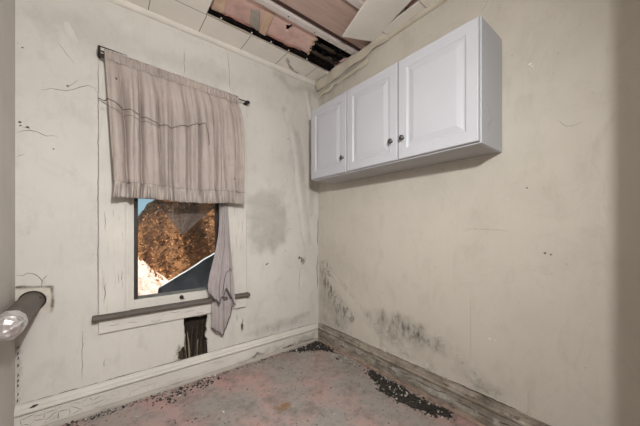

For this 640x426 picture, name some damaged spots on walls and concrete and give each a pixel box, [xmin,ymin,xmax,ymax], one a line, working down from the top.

crack [45,73,123,303]
spalling [178,314,208,360]